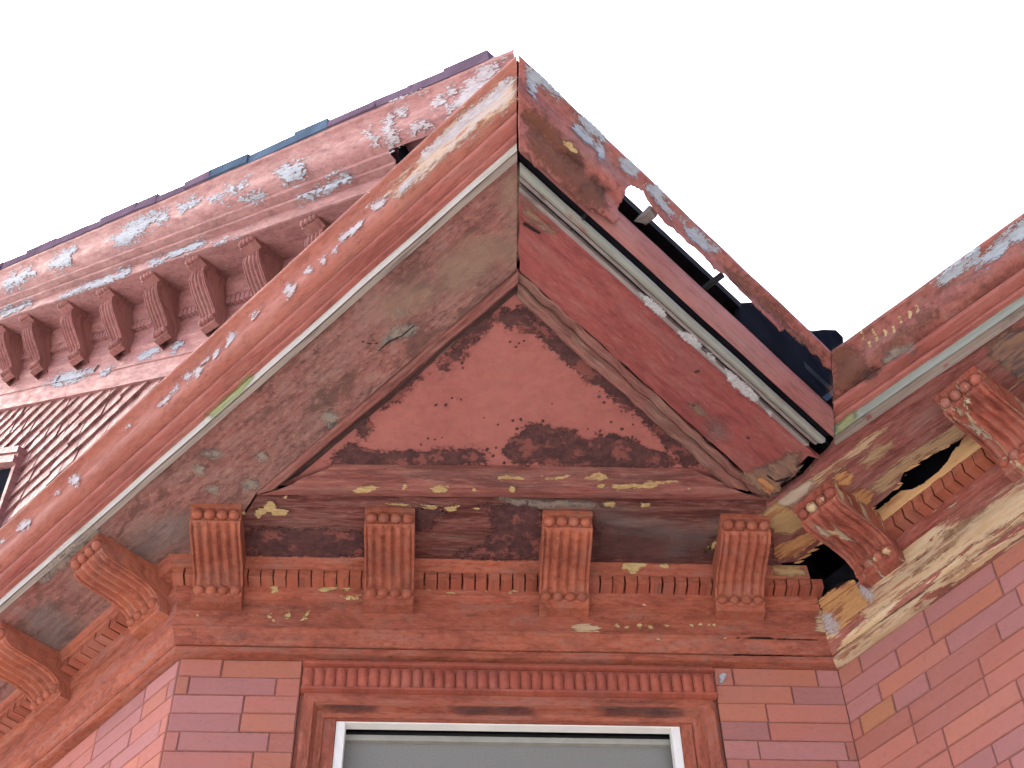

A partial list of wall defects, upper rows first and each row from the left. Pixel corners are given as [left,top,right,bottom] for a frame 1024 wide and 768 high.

peeling [105,173,269,251]
peeling [270,56,567,301]
peeling [570,111,721,255]
peeling [0,240,78,321]
peeling [58,265,131,299]
peeling [930,216,1024,287]
leakage [415,506,447,532]
leakage [453,500,542,561]
peeling [497,471,690,509]
leakage [594,518,717,563]
peeling [777,421,966,506]
peeling [834,477,1024,660]